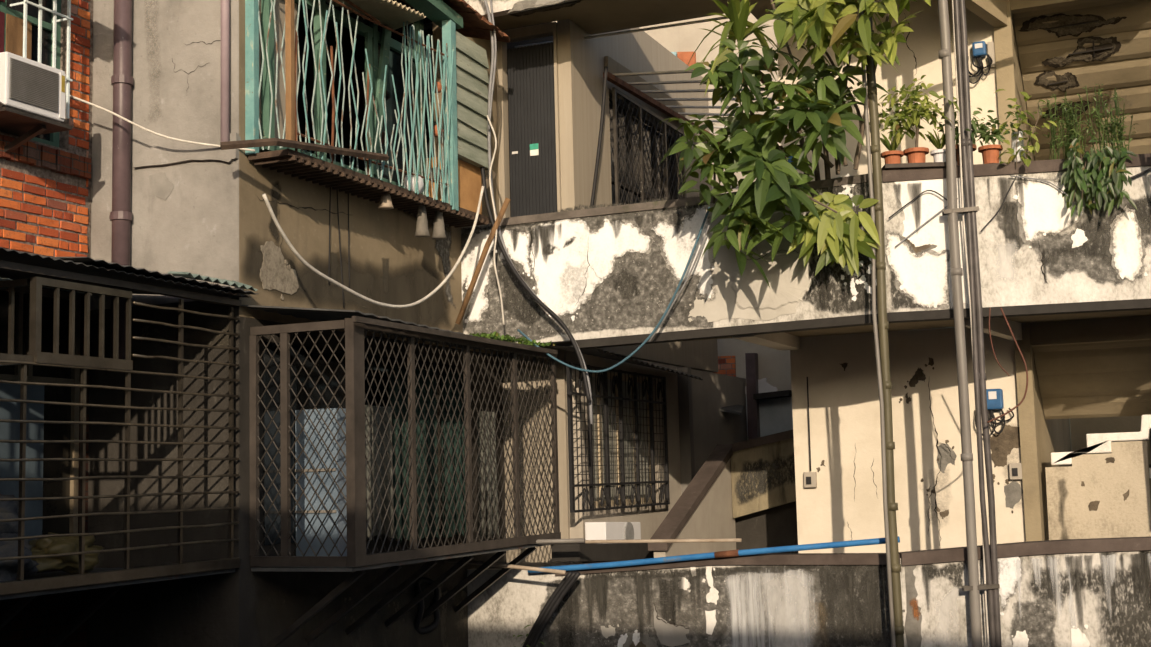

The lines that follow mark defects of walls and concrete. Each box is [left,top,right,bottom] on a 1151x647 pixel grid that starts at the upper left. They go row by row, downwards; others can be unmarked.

spalling [1018,13,1127,118]
leakage [245,241,263,283]
peeling [260,241,299,300]
leakage [269,182,713,340]
peeling [461,203,811,323]
peeling [1012,179,1088,248]
peeling [1109,207,1148,283]
crack [928,383,954,546]
peeling [990,424,1023,513]
leakage [536,565,892,647]
peeling [903,565,922,647]
leakage [1010,550,1151,647]